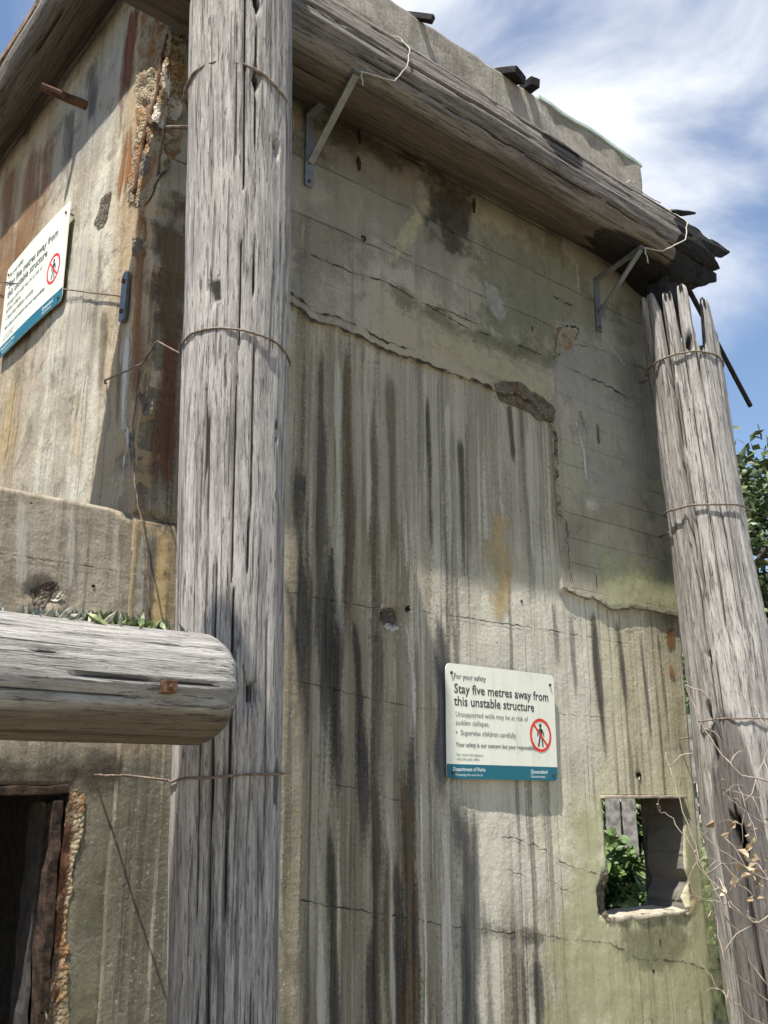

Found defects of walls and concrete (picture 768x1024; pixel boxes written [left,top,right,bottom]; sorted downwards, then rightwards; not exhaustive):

spalling [94,191,111,229]
rust [117,128,132,196]
rust [123,9,139,92]
spalling [127,11,188,206]
rust [151,335,177,483]
crack [295,246,628,398]
crack [289,291,678,645]
damp [293,355,427,1024]
damp [434,620,455,794]
spalling [45,789,85,1024]
damp [442,806,492,1024]
crack [300,899,720,998]